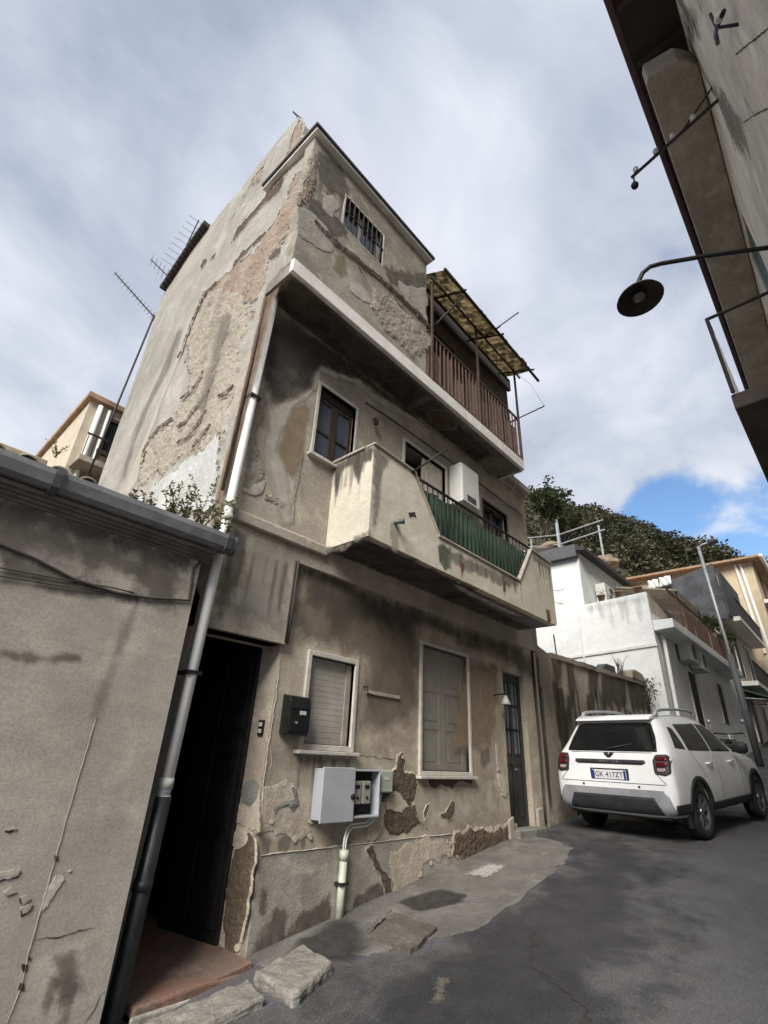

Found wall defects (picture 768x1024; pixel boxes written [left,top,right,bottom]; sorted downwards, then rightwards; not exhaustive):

flaking render [137,117,318,488]
flaking render [239,386,286,509]
water stain [263,279,489,524]
flaking render [370,287,431,360]
water stain [216,531,287,625]
water stain [327,447,529,629]
crack [6,719,98,1024]
flaking render [222,779,313,954]
water stain [400,890,467,910]
flaking render [364,743,517,895]
water stain [261,633,650,851]